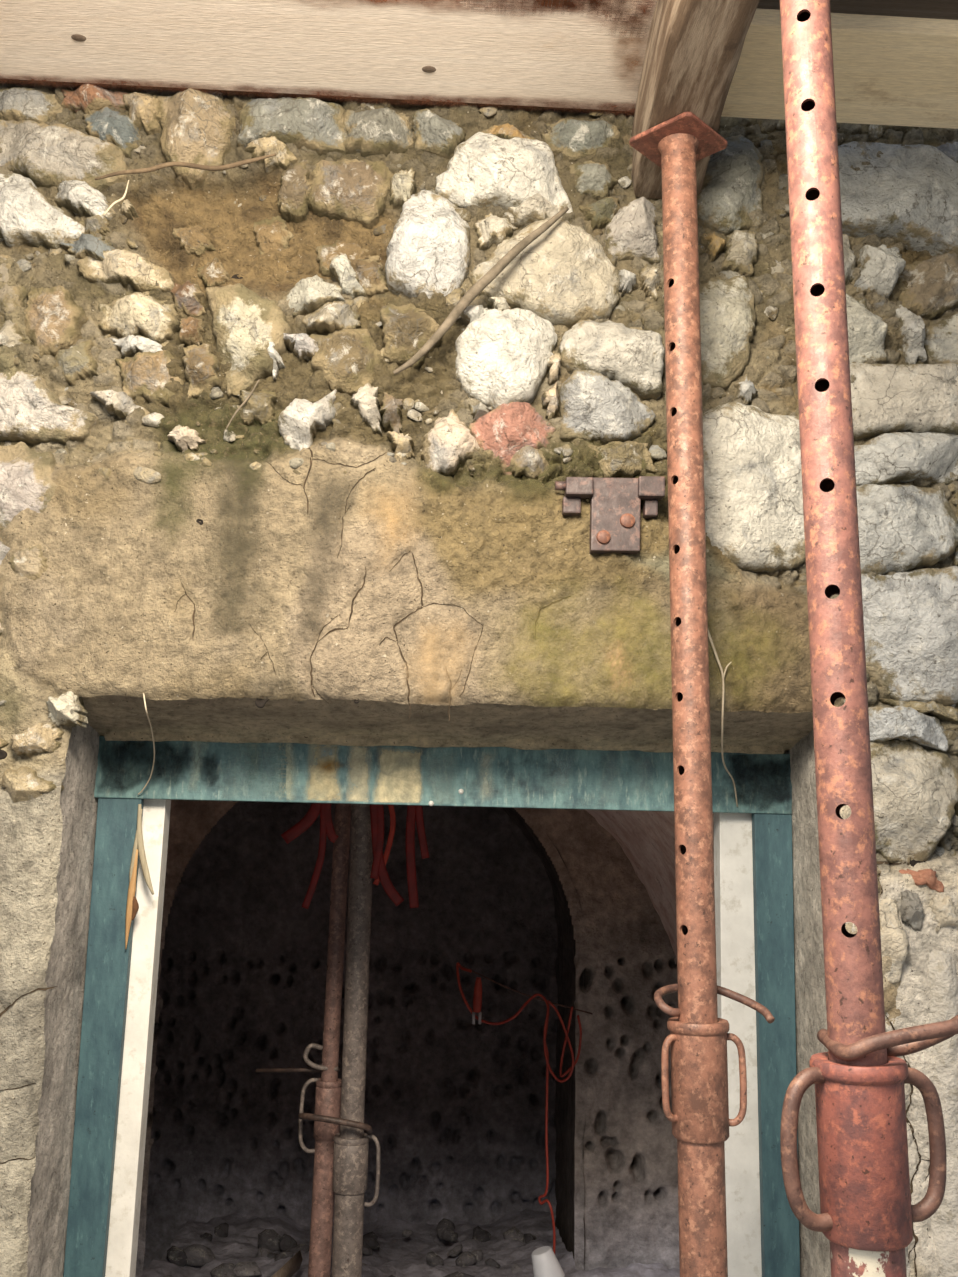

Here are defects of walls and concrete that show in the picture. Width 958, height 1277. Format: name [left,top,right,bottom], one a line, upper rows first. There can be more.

crack [266,448,483,721]
crack [885,1015,930,1277]